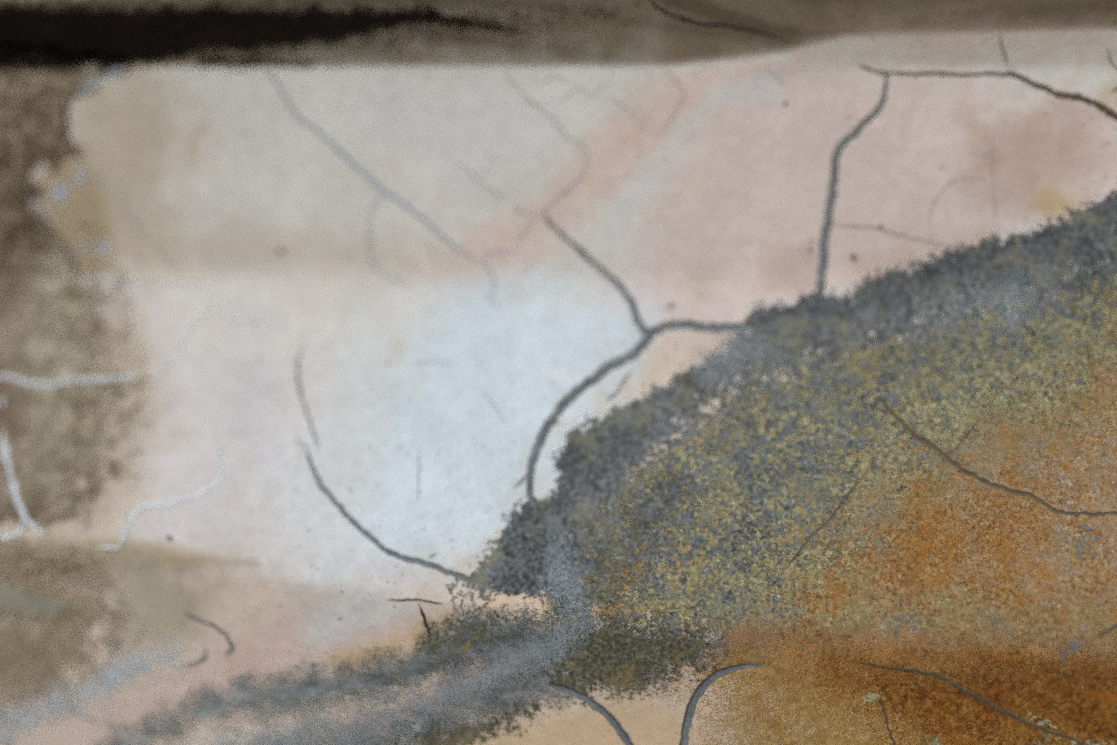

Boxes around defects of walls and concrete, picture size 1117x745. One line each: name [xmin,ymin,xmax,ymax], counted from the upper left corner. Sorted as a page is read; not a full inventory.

crack [817,36,1117,298]
spalling [0,52,191,745]
crack [296,344,475,582]
crack [386,598,444,641]
crack [546,684,633,745]
water stain [89,189,1117,745]
crack [514,215,760,512]
crack [679,664,763,745]
crack [787,477,862,567]
rust [652,281,1117,745]
crack [854,661,1089,745]
crack [876,397,1117,516]